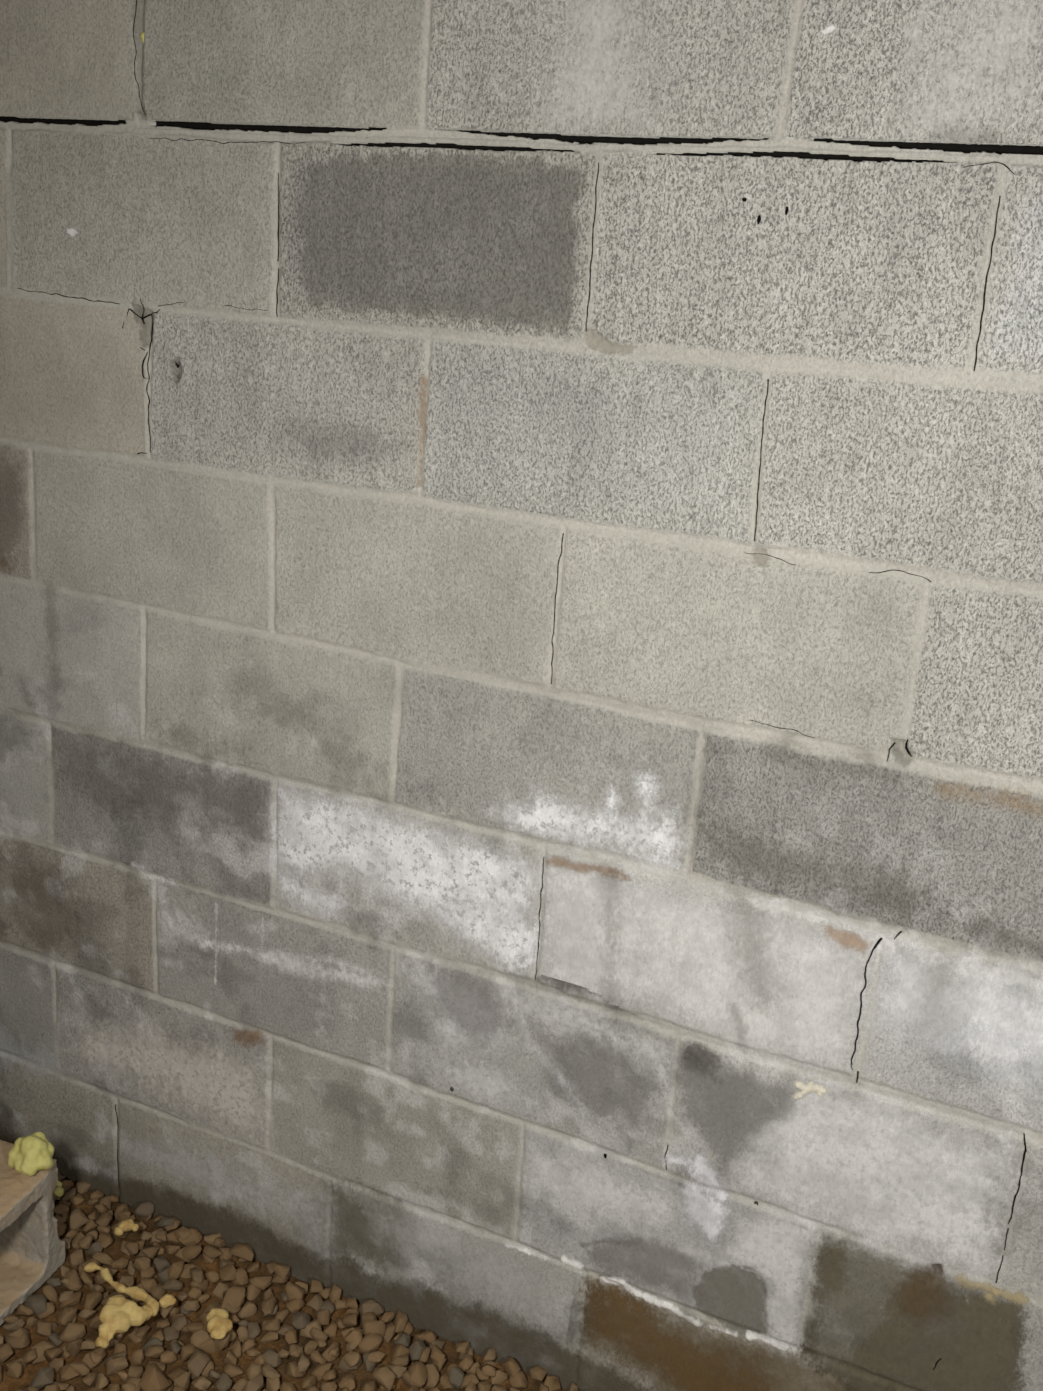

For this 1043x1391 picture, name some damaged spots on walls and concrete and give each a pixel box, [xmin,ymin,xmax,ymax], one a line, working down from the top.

crack [0,0,1043,371]
crack [18,288,184,454]
water stain [131,862,384,988]
water stain [0,1127,17,1144]
water stain [75,1023,268,1138]
water stain [53,1144,641,1391]
water stain [268,772,1043,1391]
crack [851,931,902,1083]
crack [995,1133,1027,1283]